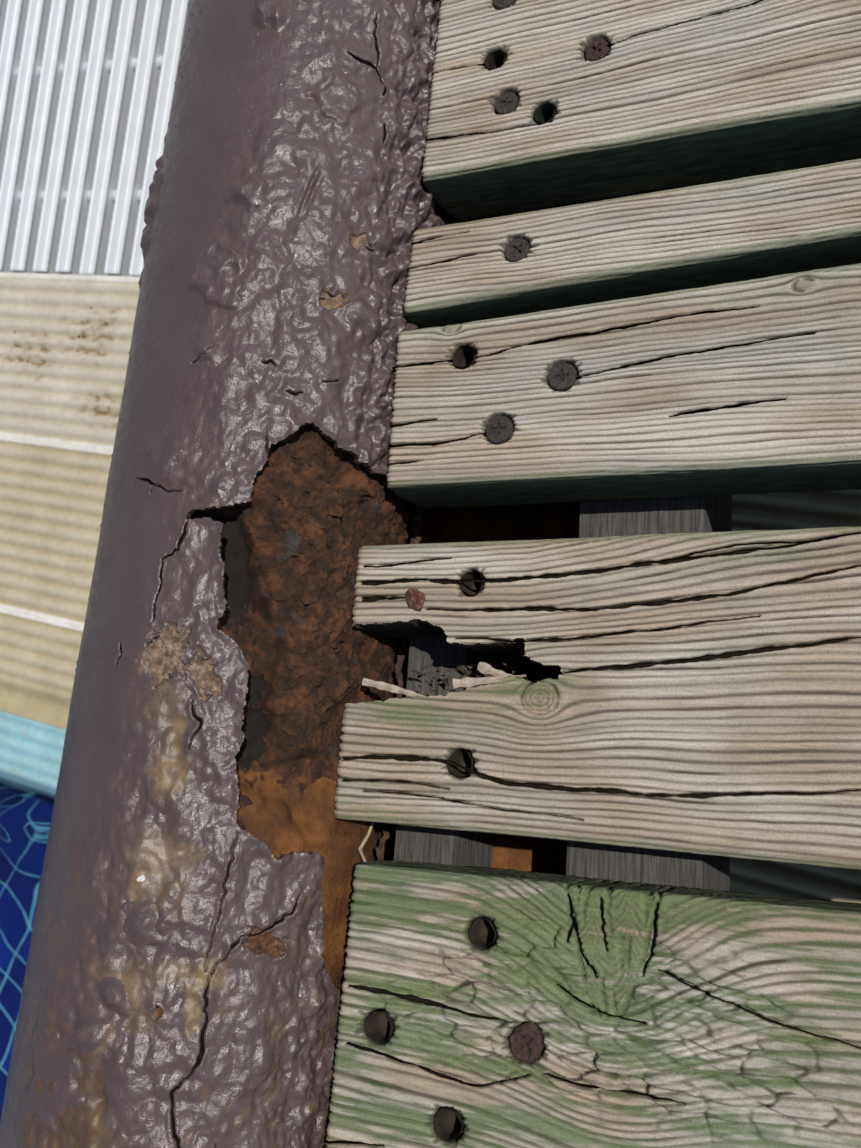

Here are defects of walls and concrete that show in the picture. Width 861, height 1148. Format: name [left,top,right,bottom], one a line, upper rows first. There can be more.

crack [347,1,390,95]
crack [137,478,182,492]
crack [152,520,188,621]
crack [188,700,202,750]
rust [236,794,257,837]
crack [170,841,301,1148]